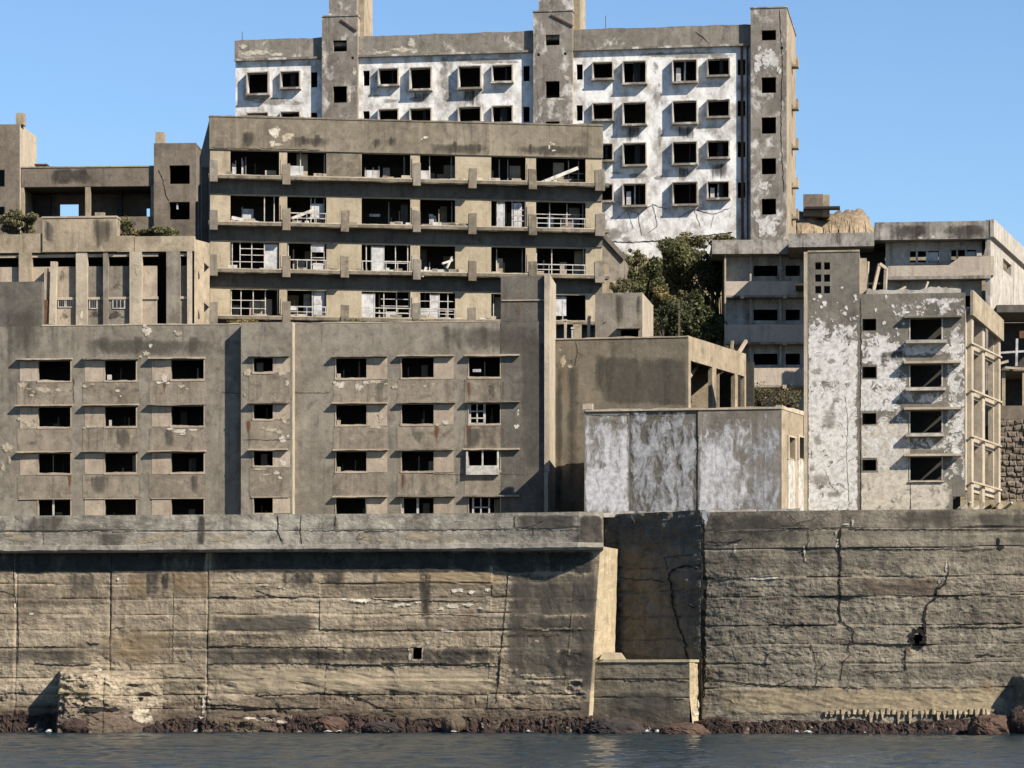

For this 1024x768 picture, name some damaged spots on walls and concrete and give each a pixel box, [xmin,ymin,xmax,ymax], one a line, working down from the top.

crack [613,204,732,243]
spalling [260,413,289,443]
damp [0,358,789,686]
crack [164,298,1024,712]
peeling [808,287,965,548]